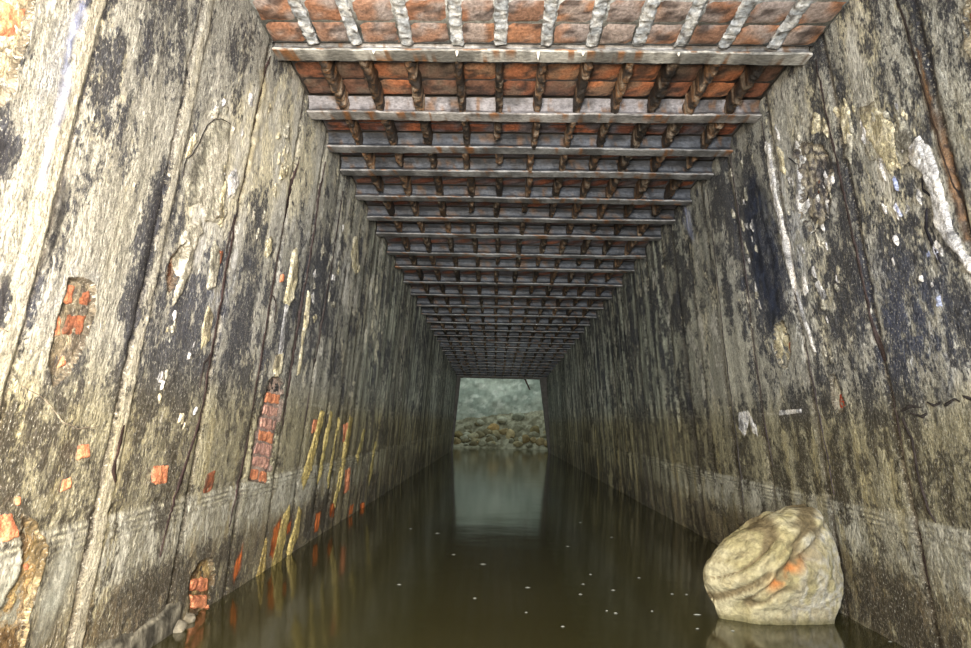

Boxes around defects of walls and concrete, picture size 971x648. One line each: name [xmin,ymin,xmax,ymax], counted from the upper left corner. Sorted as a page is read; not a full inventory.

spalling [0,0,36,107]
crack [896,0,971,234]
spalling [962,0,971,59]
damp [908,135,971,274]
spalling [47,277,97,387]
spalling [248,244,340,485]
crack [788,59,971,589]
spalling [0,497,49,648]
spalling [188,557,216,614]